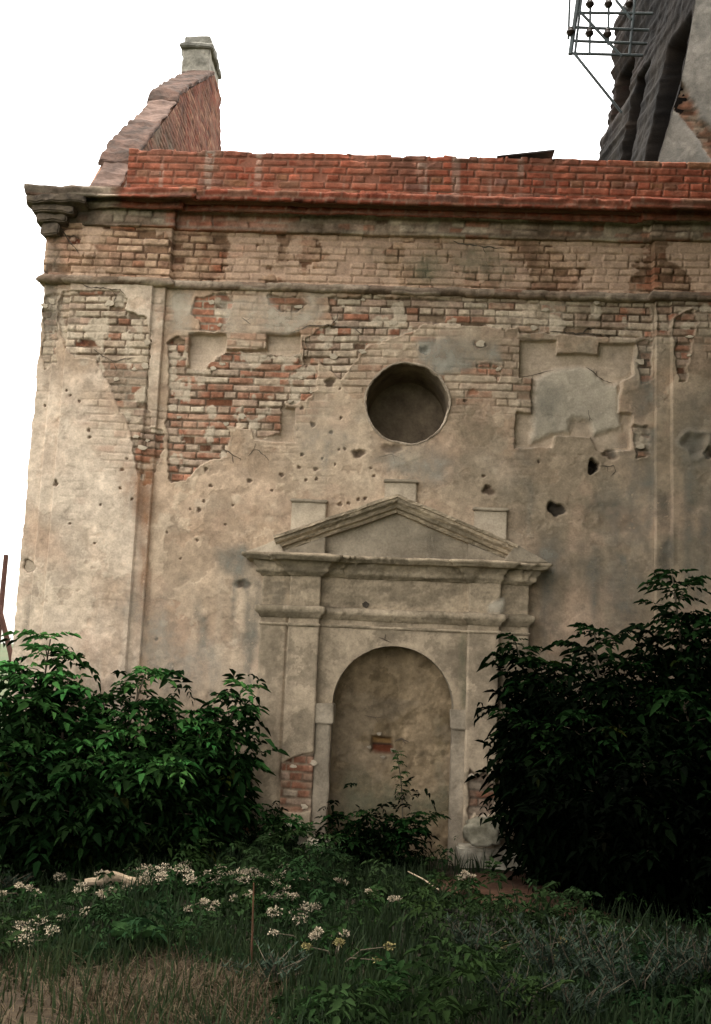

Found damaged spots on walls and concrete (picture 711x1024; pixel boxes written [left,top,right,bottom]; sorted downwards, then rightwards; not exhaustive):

flaking render [40,290,711,486]
spalling [547,502,565,517]
flaking render [367,732,395,759]
flaking render [280,752,317,813]